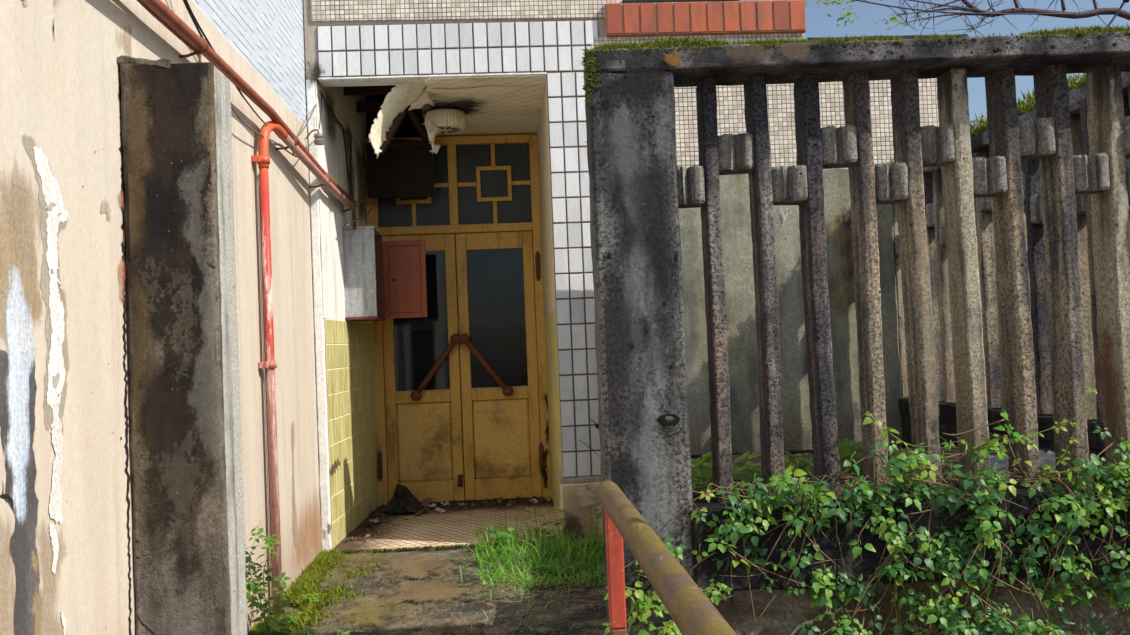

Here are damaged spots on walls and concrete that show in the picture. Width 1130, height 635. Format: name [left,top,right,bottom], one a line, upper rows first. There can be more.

leakage [598,49,675,96]
peeling [23,134,70,574]
crack [119,65,161,635]
leakage [124,30,217,594]
leakage [610,457,637,493]
leakage [604,166,676,436]
leakage [623,540,671,632]